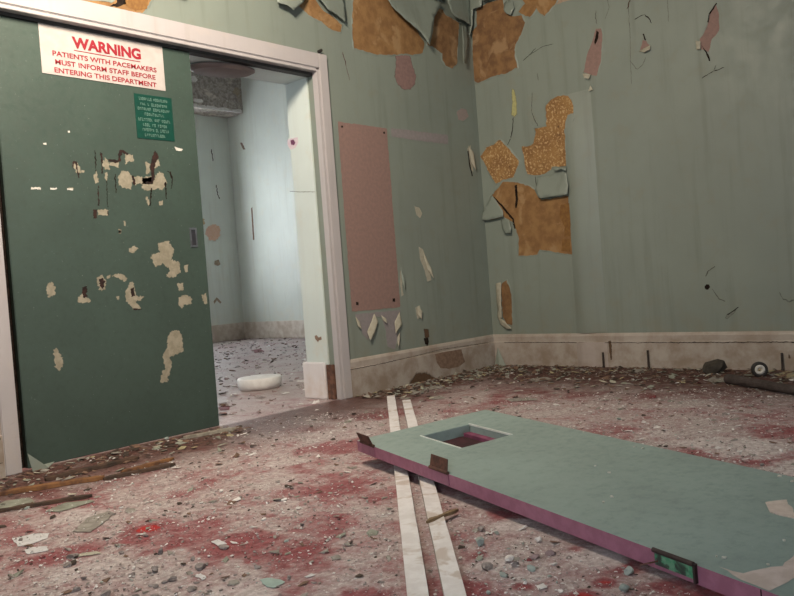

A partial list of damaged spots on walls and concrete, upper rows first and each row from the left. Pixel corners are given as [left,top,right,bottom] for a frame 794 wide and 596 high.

spalling [83,0,154,14]
spalling [277,0,568,90]
peeling [583,27,603,91]
peeling [696,3,721,61]
spalling [72,150,167,219]
spalling [467,93,575,257]
spalling [151,241,192,308]
spalling [496,279,514,329]
spalling [160,330,184,383]
peeling [435,349,465,369]